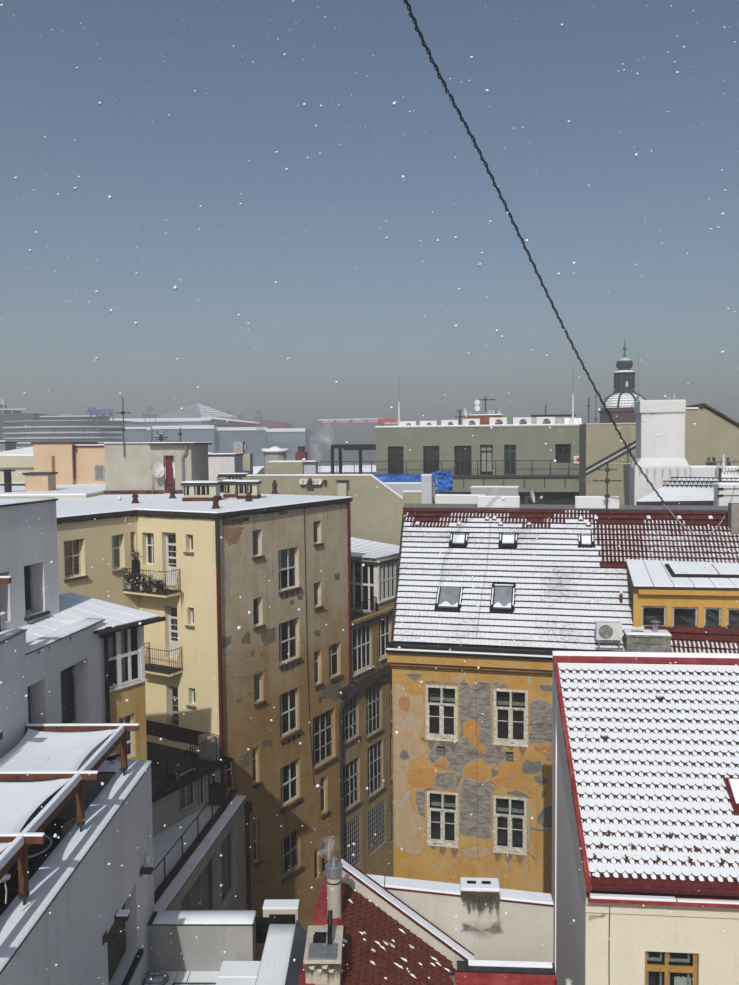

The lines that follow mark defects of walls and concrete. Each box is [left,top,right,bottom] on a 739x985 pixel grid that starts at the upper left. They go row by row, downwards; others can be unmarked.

peeling [393,673,553,859]
damp [461,891,500,913]